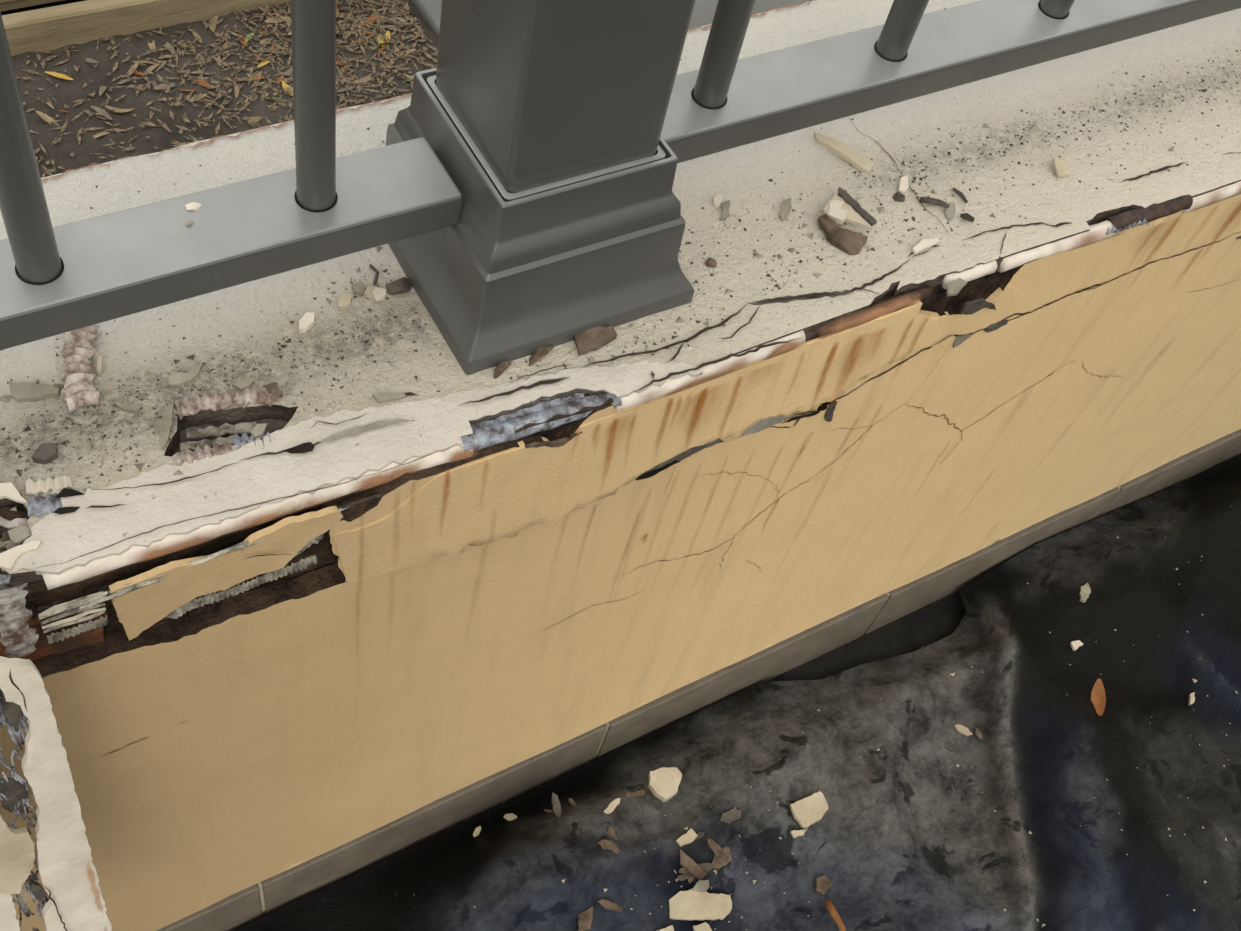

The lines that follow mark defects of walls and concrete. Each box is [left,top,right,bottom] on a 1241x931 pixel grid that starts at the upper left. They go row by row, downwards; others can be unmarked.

crack [1110,161,1188,182]
spalling [1106,194,1193,235]
crack [462,120,1071,405]
spalling [158,364,288,466]
rust [666,362,746,424]
rust [764,342,800,361]
rust [820,297,917,387]
crack [549,232,1241,628]
rust [355,467,416,492]
flaking render [0,443,381,661]
flaking render [625,767,682,802]
flaking render [0,814,35,931]